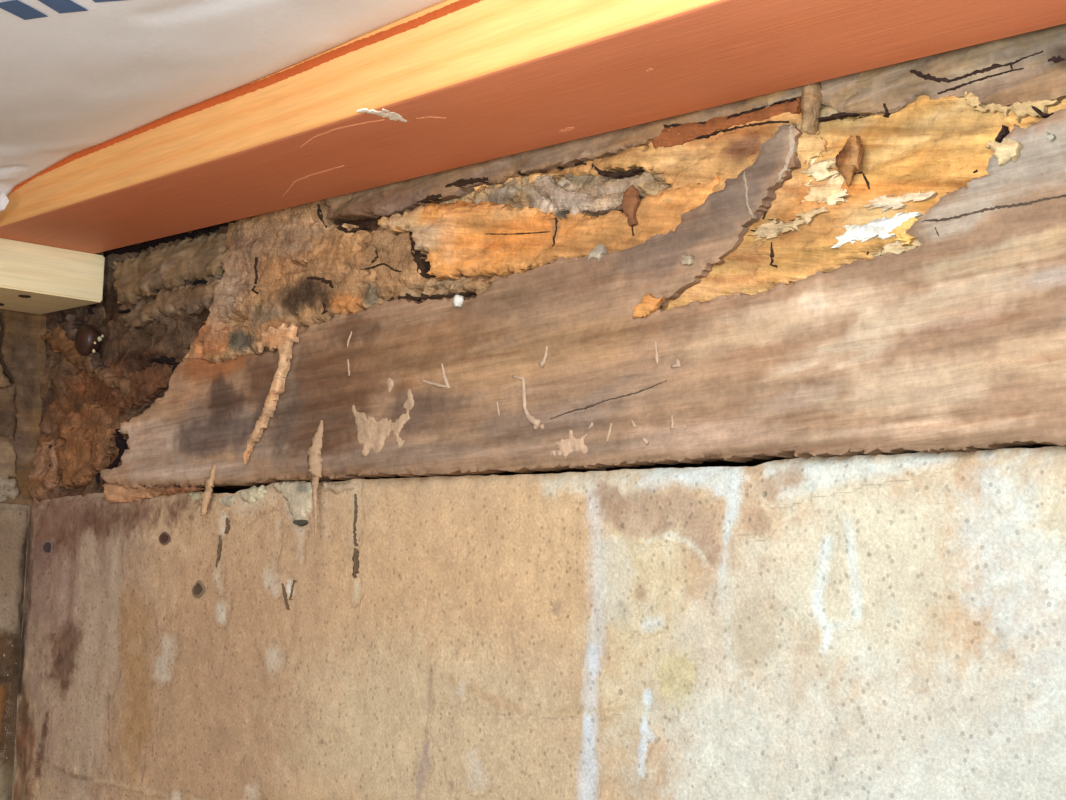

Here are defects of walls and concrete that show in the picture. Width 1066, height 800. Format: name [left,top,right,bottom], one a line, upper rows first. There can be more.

peeling [964,91,1062,123]
peeling [776,121,864,187]
peeling [986,138,1022,166]
spalling [438,171,671,227]
spalling [743,171,757,219]
peeling [588,244,608,261]
peeling [632,294,666,318]
spalling [217,481,355,538]
water stain [411,446,1066,800]